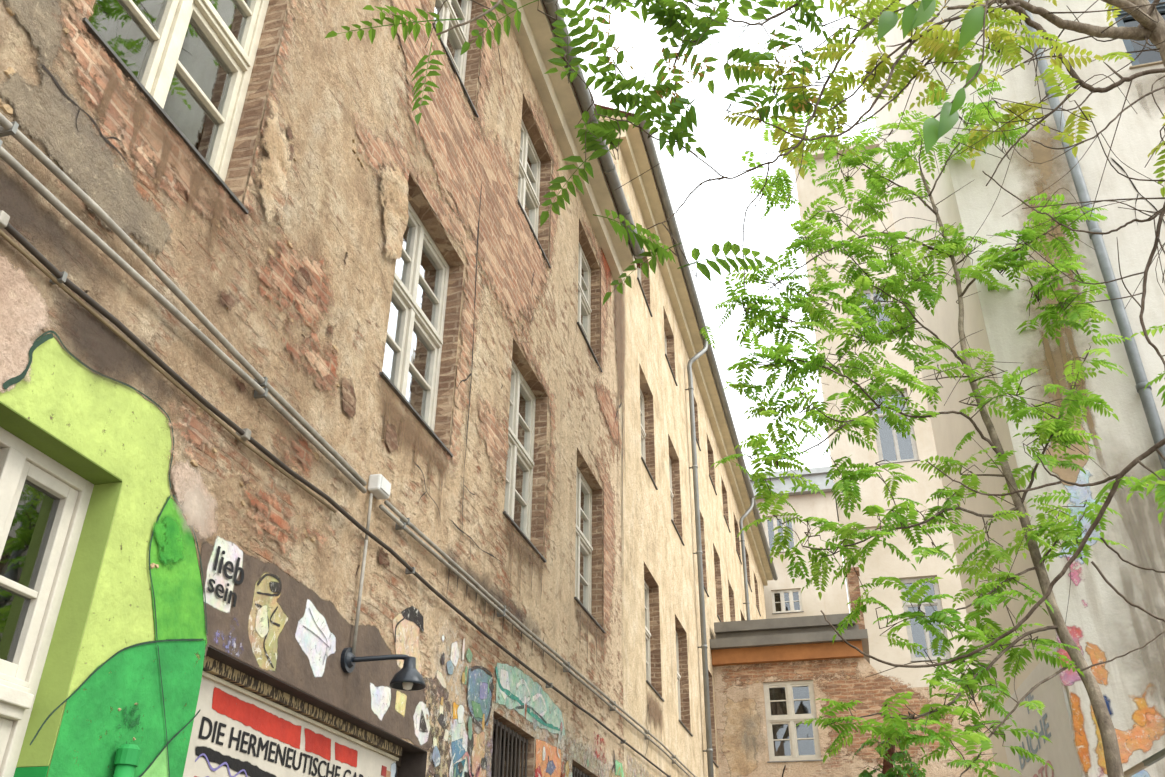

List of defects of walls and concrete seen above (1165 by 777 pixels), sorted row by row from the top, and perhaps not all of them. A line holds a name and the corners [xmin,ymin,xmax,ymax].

flaking render [0,0,306,253]
peeling [0,256,50,393]
spalling [219,289,240,311]
spalling [253,226,356,419]
peeling [150,405,228,569]